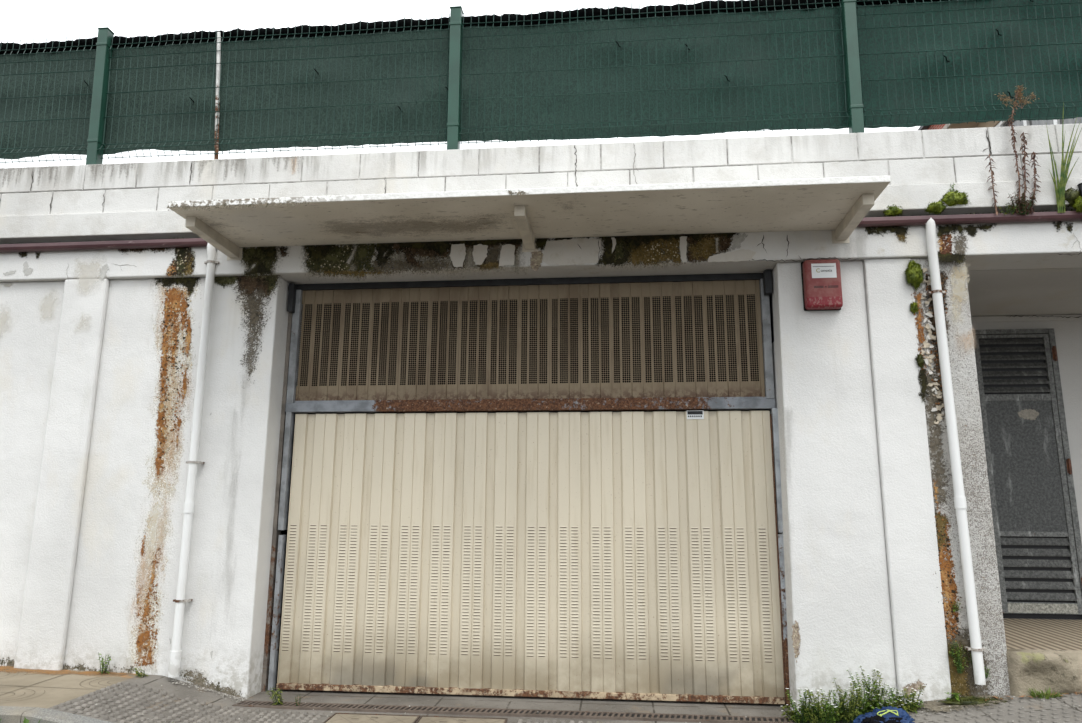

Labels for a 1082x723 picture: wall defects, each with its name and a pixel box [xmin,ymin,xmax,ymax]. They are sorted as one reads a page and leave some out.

leakage [233,246,279,389]
leakage [303,239,523,281]
leakage [553,233,739,267]
rust [153,288,193,495]
rust [134,533,161,666]
rust [933,479,966,642]